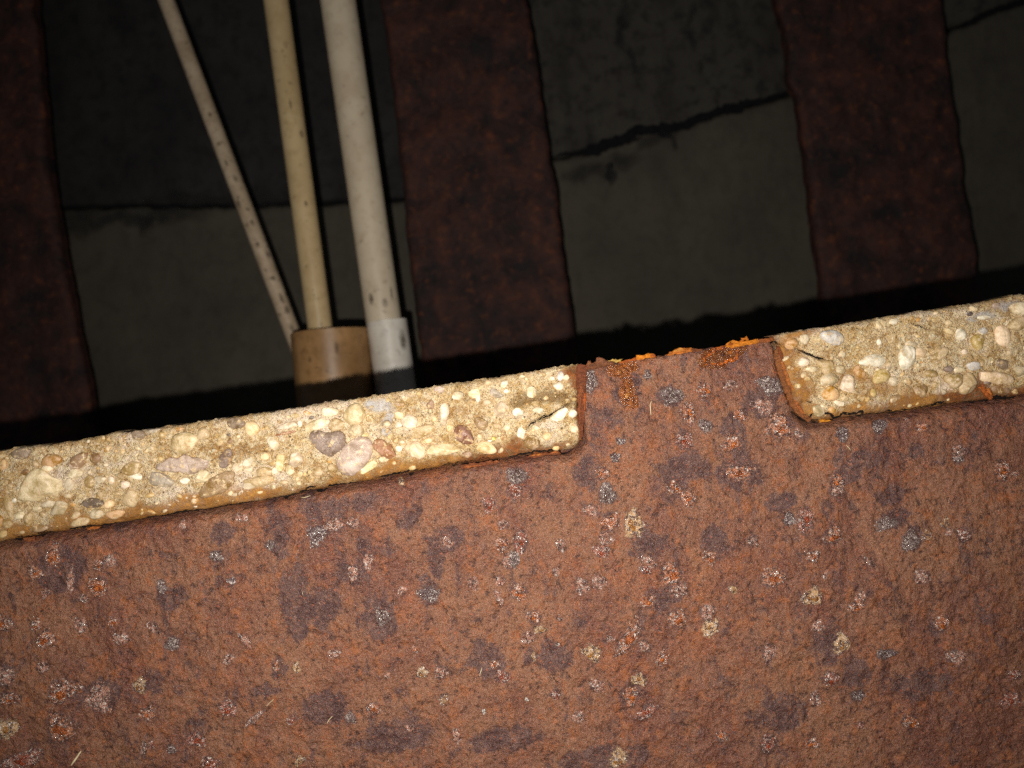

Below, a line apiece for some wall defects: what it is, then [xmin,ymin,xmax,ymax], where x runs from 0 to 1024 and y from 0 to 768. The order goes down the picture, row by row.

crack [553,91,789,181]
rust [660,345,748,450]
rust [720,330,1024,481]
rust [300,438,565,499]
rust [582,438,647,559]
rust [0,487,282,603]
rust [482,495,563,662]
rust [580,594,669,666]
rust [637,555,688,627]
rust [699,603,721,638]
rust [811,619,850,655]
rust [0,679,112,768]